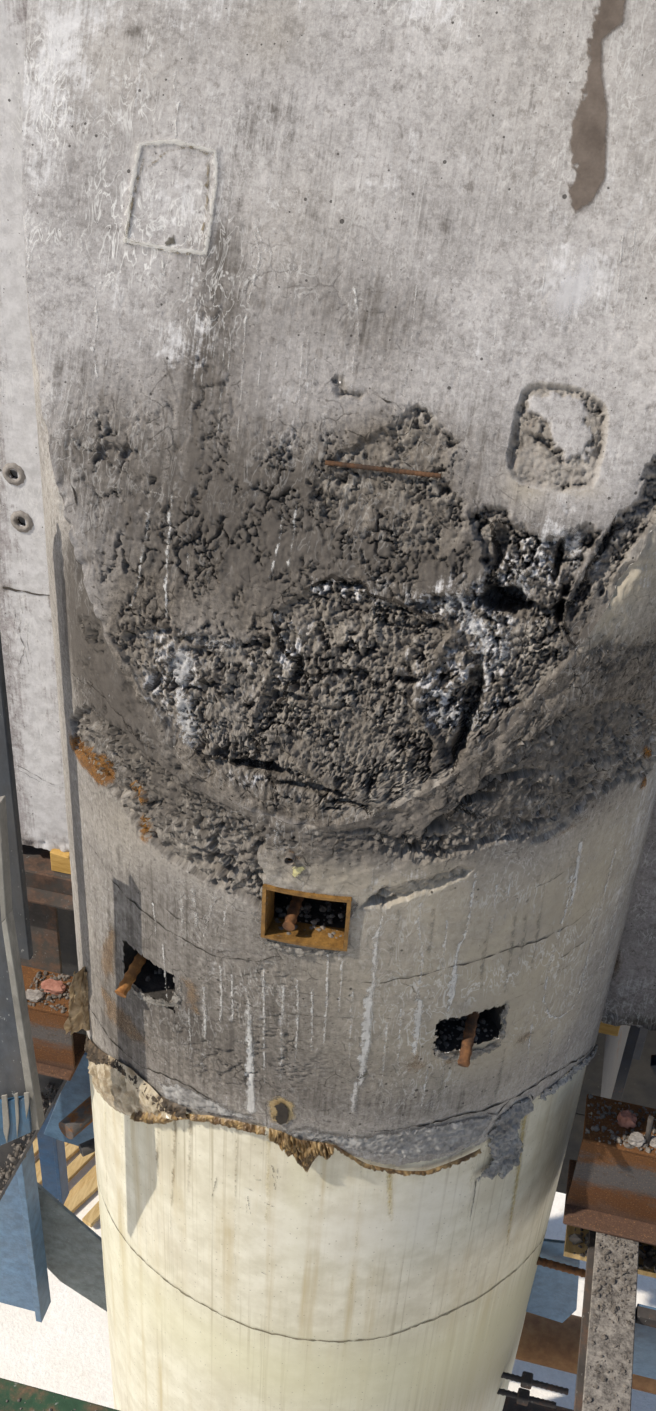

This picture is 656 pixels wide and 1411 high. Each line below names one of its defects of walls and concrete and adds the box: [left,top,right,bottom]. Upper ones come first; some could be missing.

damp [568,0,626,212]
spalling [505,380,611,495]
spalling [69,400,656,958]
rust [69,735,115,785]
rust [130,780,151,841]
spalling [115,953,181,1008]
crack [365,919,584,1020]
spalling [434,1005,509,1067]
peeling [159,1082,252,1118]